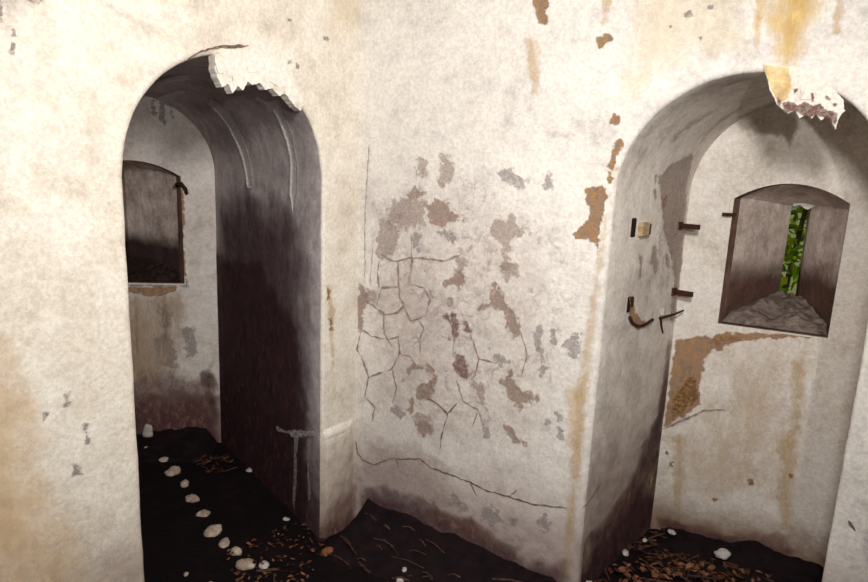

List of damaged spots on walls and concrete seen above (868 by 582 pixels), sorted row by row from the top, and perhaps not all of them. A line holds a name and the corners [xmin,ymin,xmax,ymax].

spalling [533,0,549,24]
rust [770,0,809,56]
flaking render [208,50,305,111]
flaking render [761,63,846,130]
spalling [376,185,464,260]
spalling [573,138,624,246]
spalling [443,257,472,340]
crack [356,146,601,508]
spalling [477,213,523,338]
spalling [390,364,438,437]
spalling [489,347,540,411]
spalling [664,336,739,426]